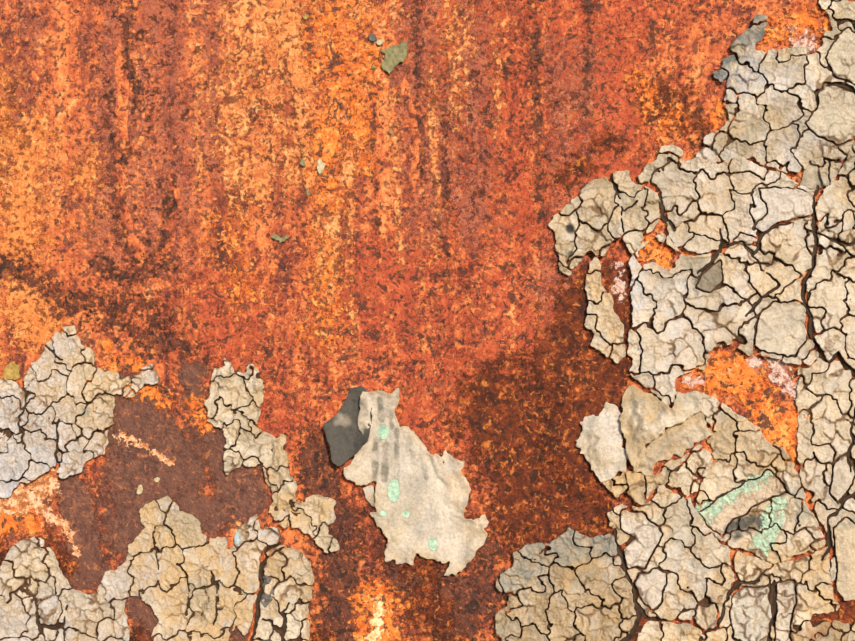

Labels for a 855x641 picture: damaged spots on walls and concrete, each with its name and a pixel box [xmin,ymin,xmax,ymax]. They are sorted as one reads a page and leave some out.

rust [634,229,675,271]
peeling [495,0,855,641]
crack [698,186,855,375]
peeling [0,325,159,498]
rust [679,341,810,469]
peeling [0,358,340,641]
crack [821,407,855,559]
rust [125,587,167,641]
crack [250,542,290,641]
crack [614,529,664,641]
crack [704,579,776,641]
rust [803,599,855,641]